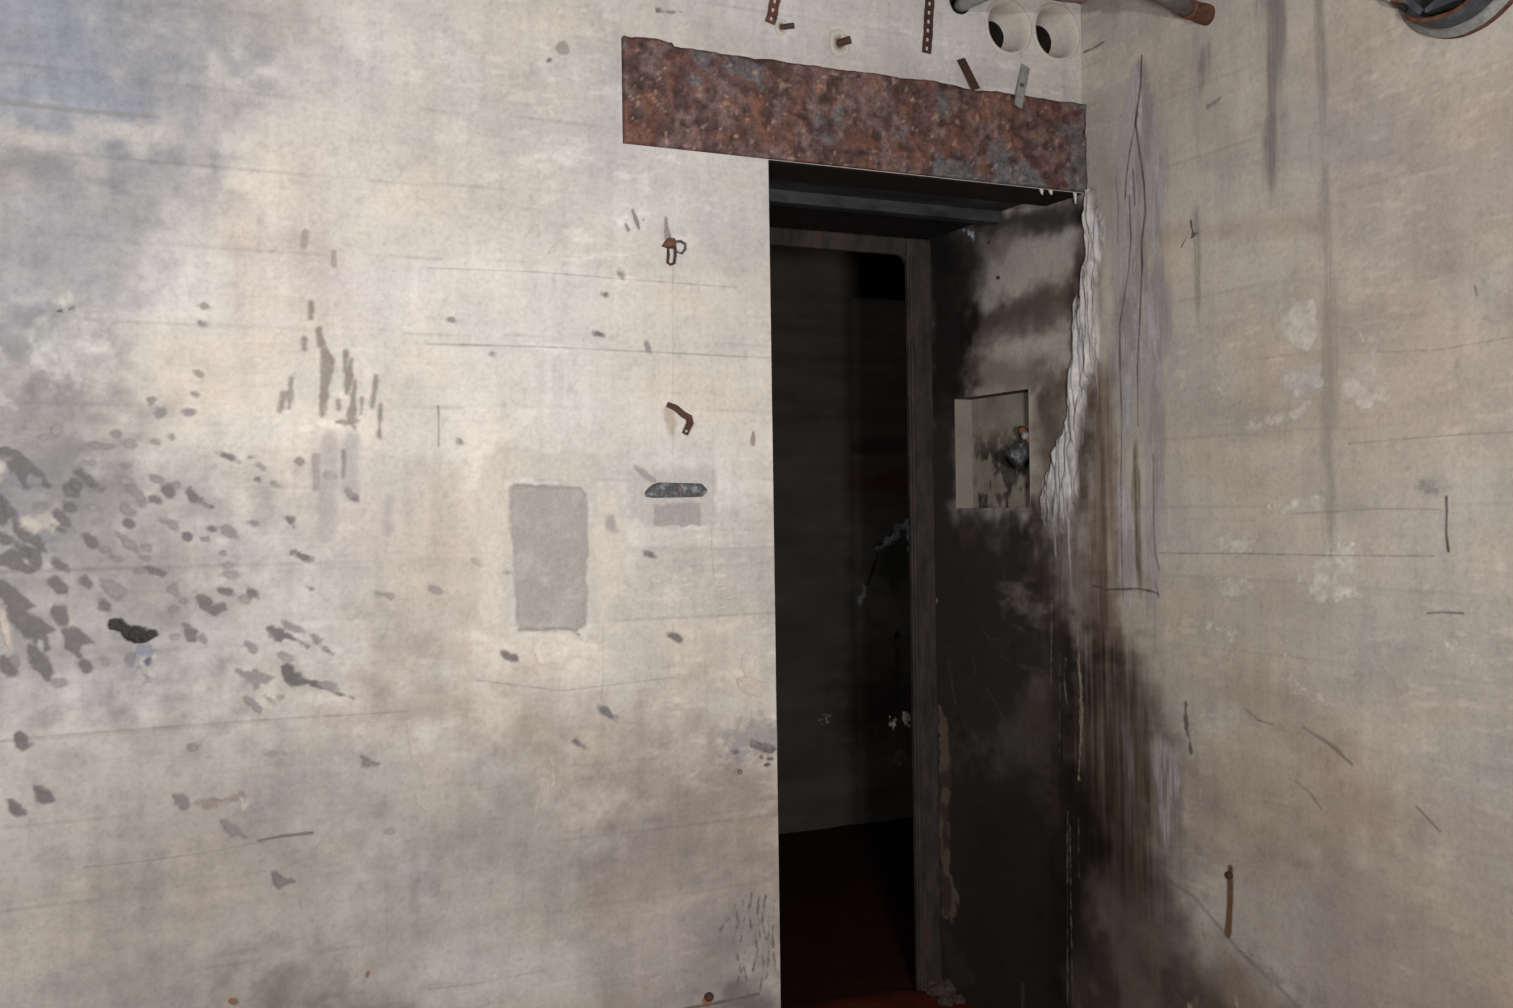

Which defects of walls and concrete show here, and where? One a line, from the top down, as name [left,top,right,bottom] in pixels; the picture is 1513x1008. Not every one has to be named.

peeling [27,291,118,383]
water stain [1040,65,1169,605]
peeling [21,517,61,532]
water stain [1067,812,1223,1008]